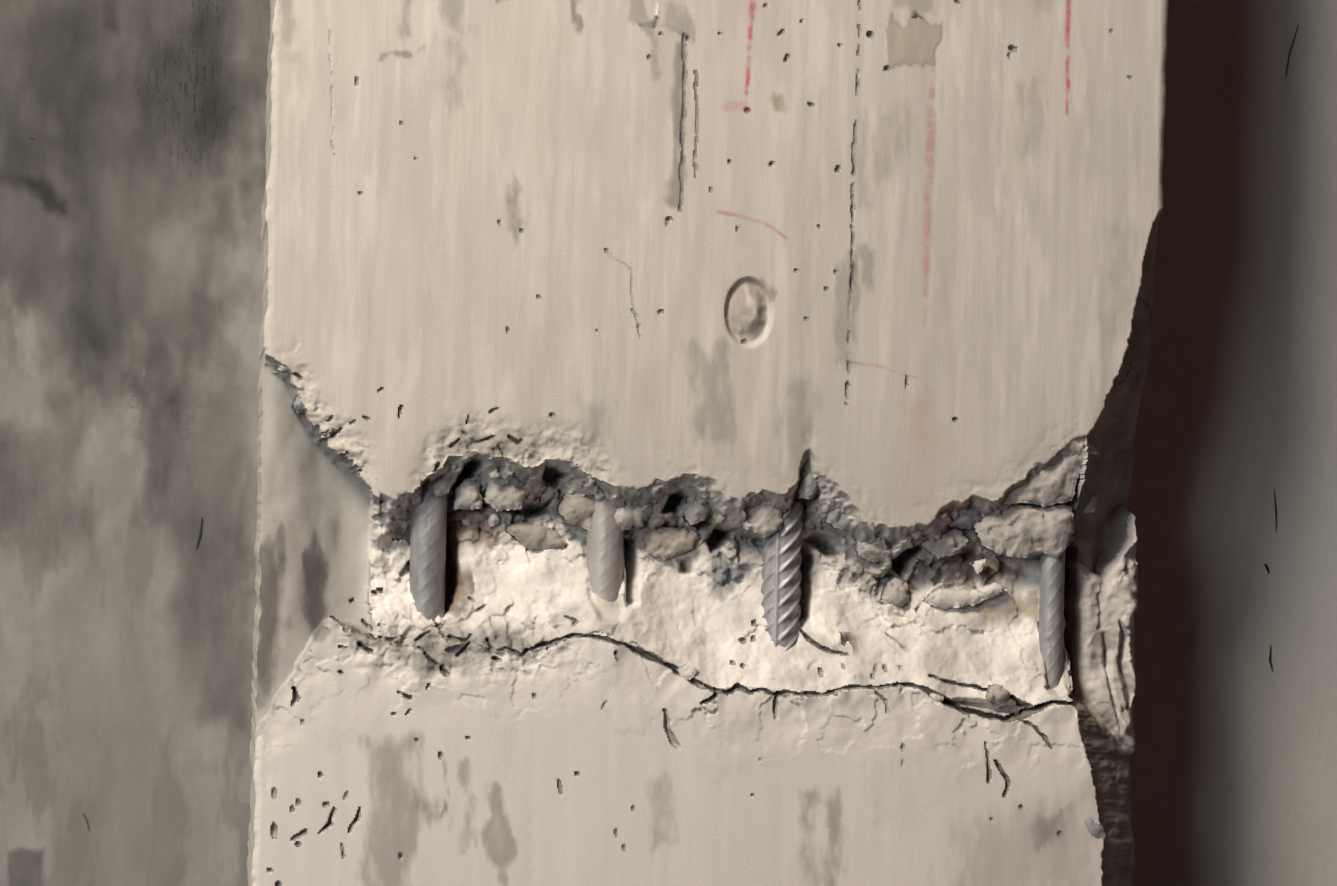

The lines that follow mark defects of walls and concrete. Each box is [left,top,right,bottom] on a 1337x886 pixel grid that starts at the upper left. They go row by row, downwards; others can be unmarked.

spalling [255,211,1162,886]
crack [523,629,1076,798]